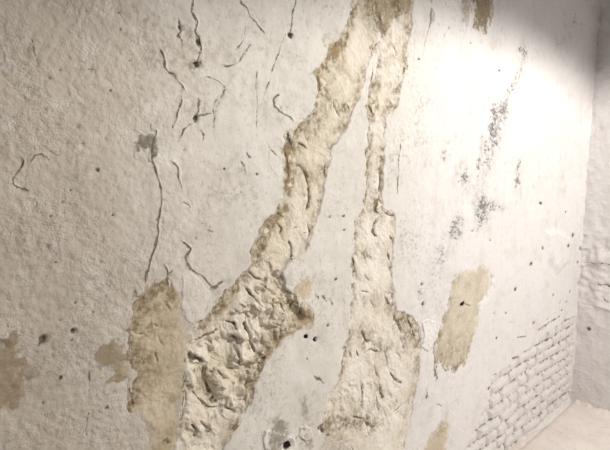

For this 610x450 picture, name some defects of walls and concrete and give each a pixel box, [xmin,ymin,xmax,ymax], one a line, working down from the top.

crack [160,0,225,142]
crack [221,0,267,67]
crack [256,0,296,143]
crack [13,144,59,193]
crack [145,124,188,287]
crack [180,240,223,289]
flaking render [126,0,496,450]
leakage [476,83,513,177]
leakage [0,331,26,409]
leakage [96,340,127,383]
flaking render [464,317,574,450]